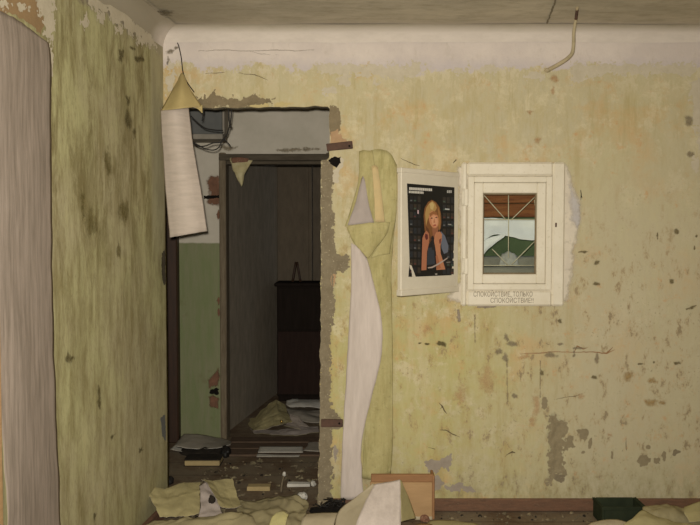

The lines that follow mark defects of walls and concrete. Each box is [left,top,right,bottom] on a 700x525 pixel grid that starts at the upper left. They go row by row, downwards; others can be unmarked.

peeling [0,0,57,77]
peeling [79,0,158,52]
peeling [164,60,177,97]
flaking render [195,89,291,108]
flaking render [329,105,347,143]
flaking render [204,176,220,219]
flaking render [317,157,350,506]
crack [523,346,614,354]
flaking render [209,370,220,408]
flaking render [424,453,476,493]
flaking render [541,397,592,486]
flaking render [637,445,681,467]